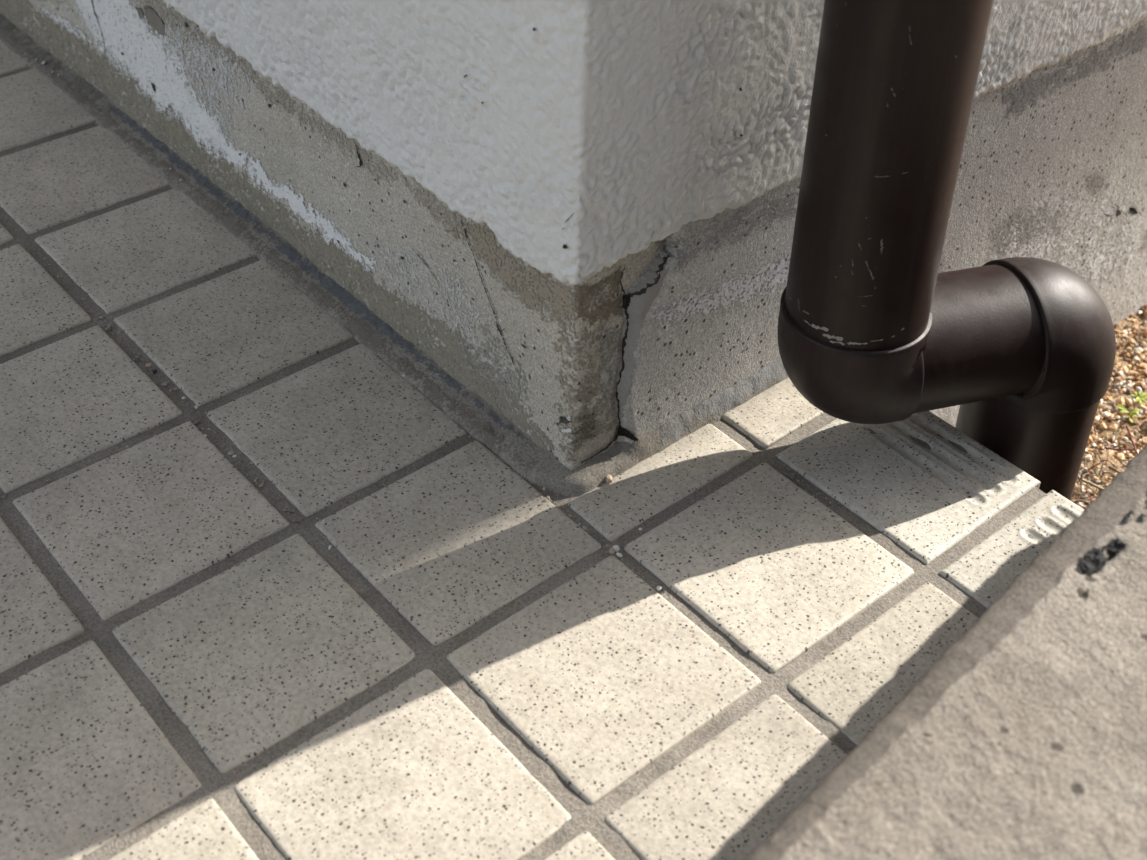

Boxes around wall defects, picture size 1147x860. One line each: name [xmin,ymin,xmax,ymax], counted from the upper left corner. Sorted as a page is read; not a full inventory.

water stain [0,0,630,481]
crack [461,220,520,378]
crack [581,254,670,463]